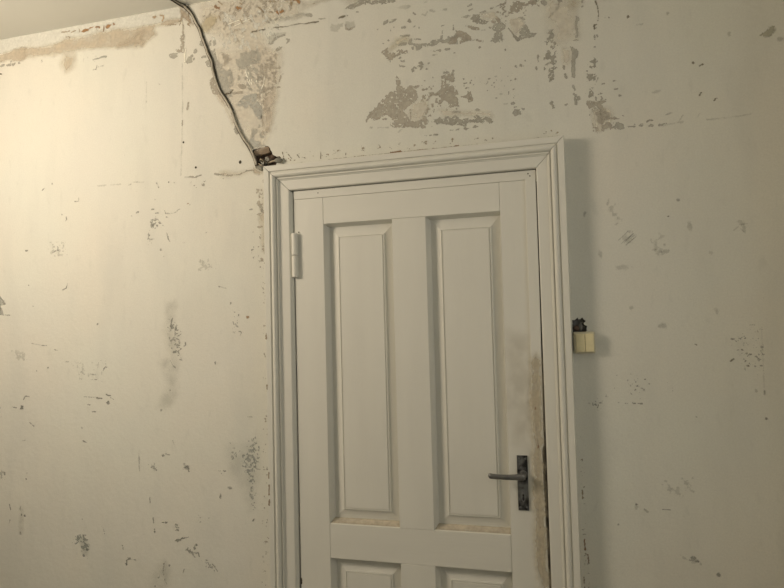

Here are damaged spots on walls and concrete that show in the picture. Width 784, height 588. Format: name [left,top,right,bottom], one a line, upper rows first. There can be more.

peeling [169,13,281,166]
spalling [236,0,300,24]
peeling [345,0,395,12]
peeling [366,0,562,136]
peeling [535,16,665,132]